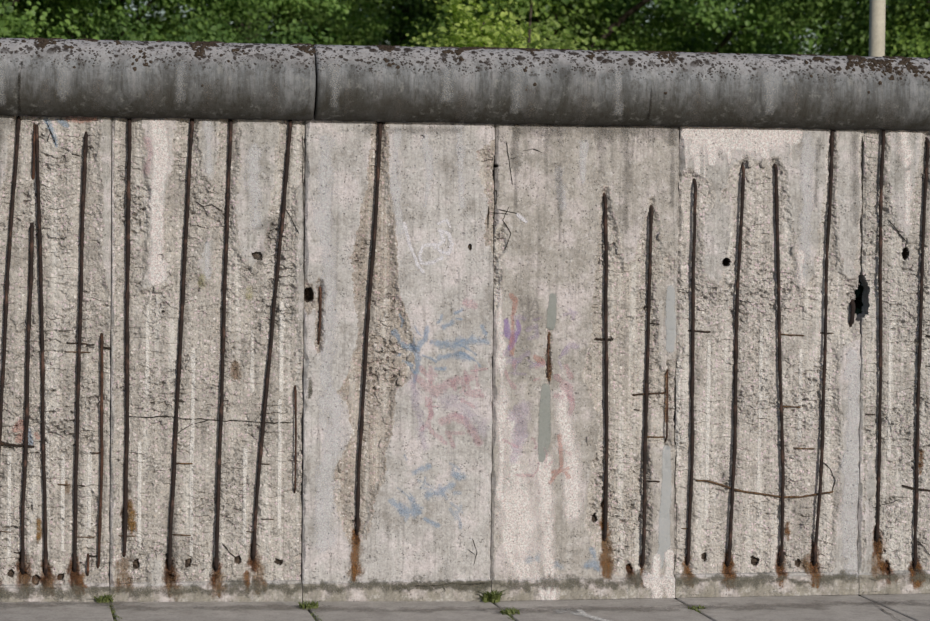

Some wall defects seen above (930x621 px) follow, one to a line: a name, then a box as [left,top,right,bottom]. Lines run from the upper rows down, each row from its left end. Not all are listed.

spalling [0,115,327,585]
spalling [329,121,420,545]
spalling [581,129,930,575]
rust [67,556,86,594]
rust [165,554,179,597]
rust [243,544,266,593]
rust [348,518,364,580]
rust [600,501,614,578]
rust [722,550,737,586]
rust [776,522,790,587]
rust [800,540,821,588]
rust [871,525,893,580]